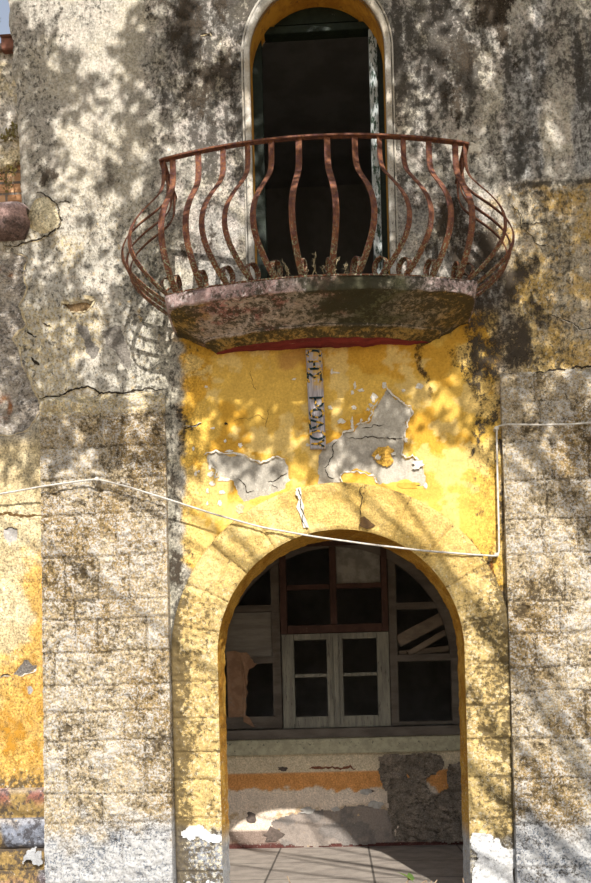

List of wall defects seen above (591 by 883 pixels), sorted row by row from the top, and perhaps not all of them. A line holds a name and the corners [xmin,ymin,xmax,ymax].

damp [144,0,240,125]
damp [436,0,521,129]
damp [31,147,59,189]
damp [174,226,217,263]
damp [410,182,551,456]
crack [39,385,162,399]
peeling [318,381,428,489]
crack [0,511,40,519]
peeling [192,439,290,514]
spalling [359,485,375,529]
peeling [181,825,222,843]
spalling [263,752,515,883]